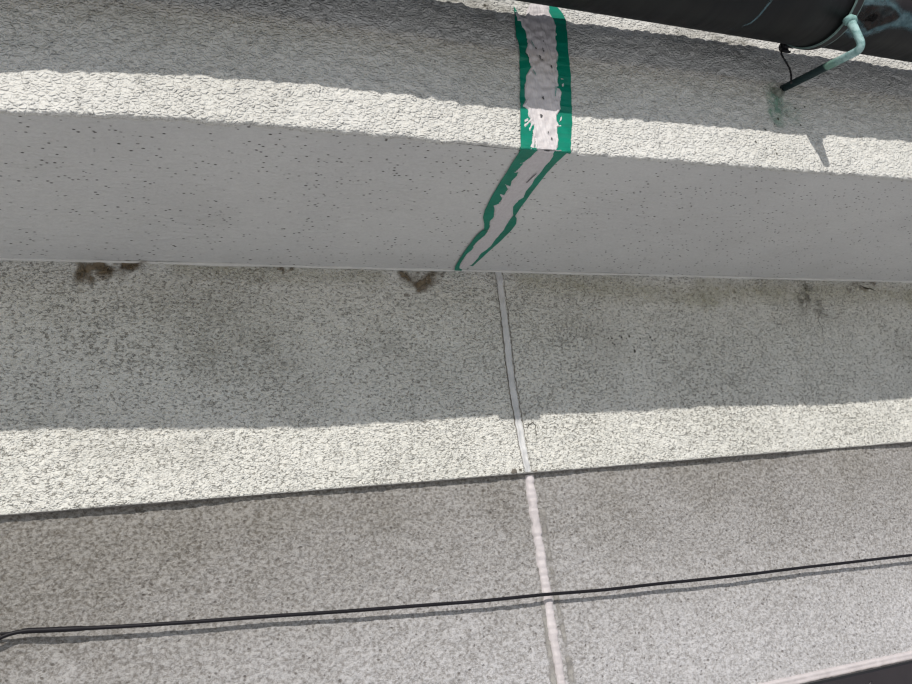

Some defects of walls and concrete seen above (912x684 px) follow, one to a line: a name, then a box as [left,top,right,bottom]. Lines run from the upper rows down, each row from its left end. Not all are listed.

rust [77,260,142,282]